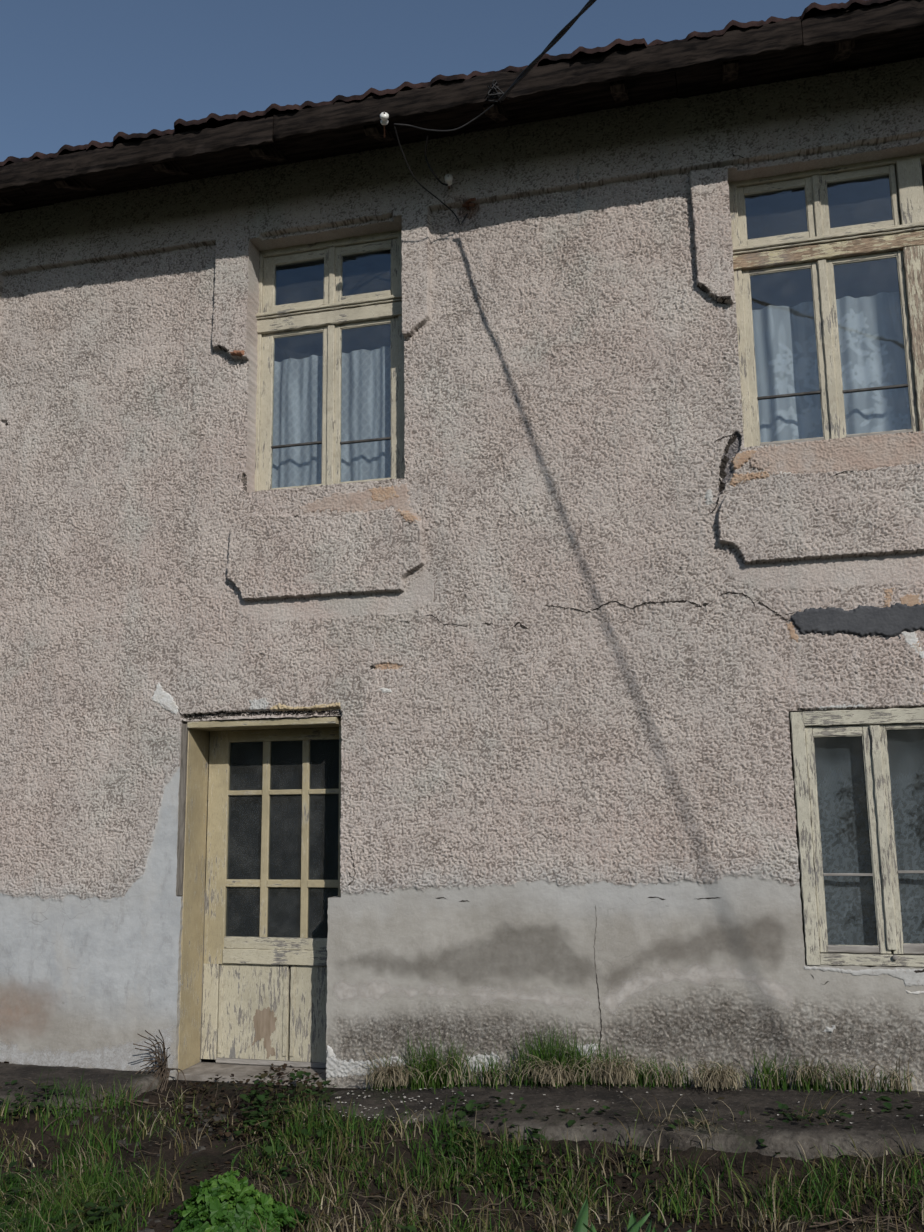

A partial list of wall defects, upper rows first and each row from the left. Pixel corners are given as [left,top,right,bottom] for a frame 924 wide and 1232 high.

peeling [704,431,924,515]
crack [399,591,794,661]
peeling [902,631,924,659]
flaking render [152,683,342,721]
peeling [795,685,924,711]
crack [594,906,602,1053]
peeling [804,965,924,995]
peeling [326,1045,407,1078]
peeling [465,1051,500,1072]
peeling [575,1043,598,1059]